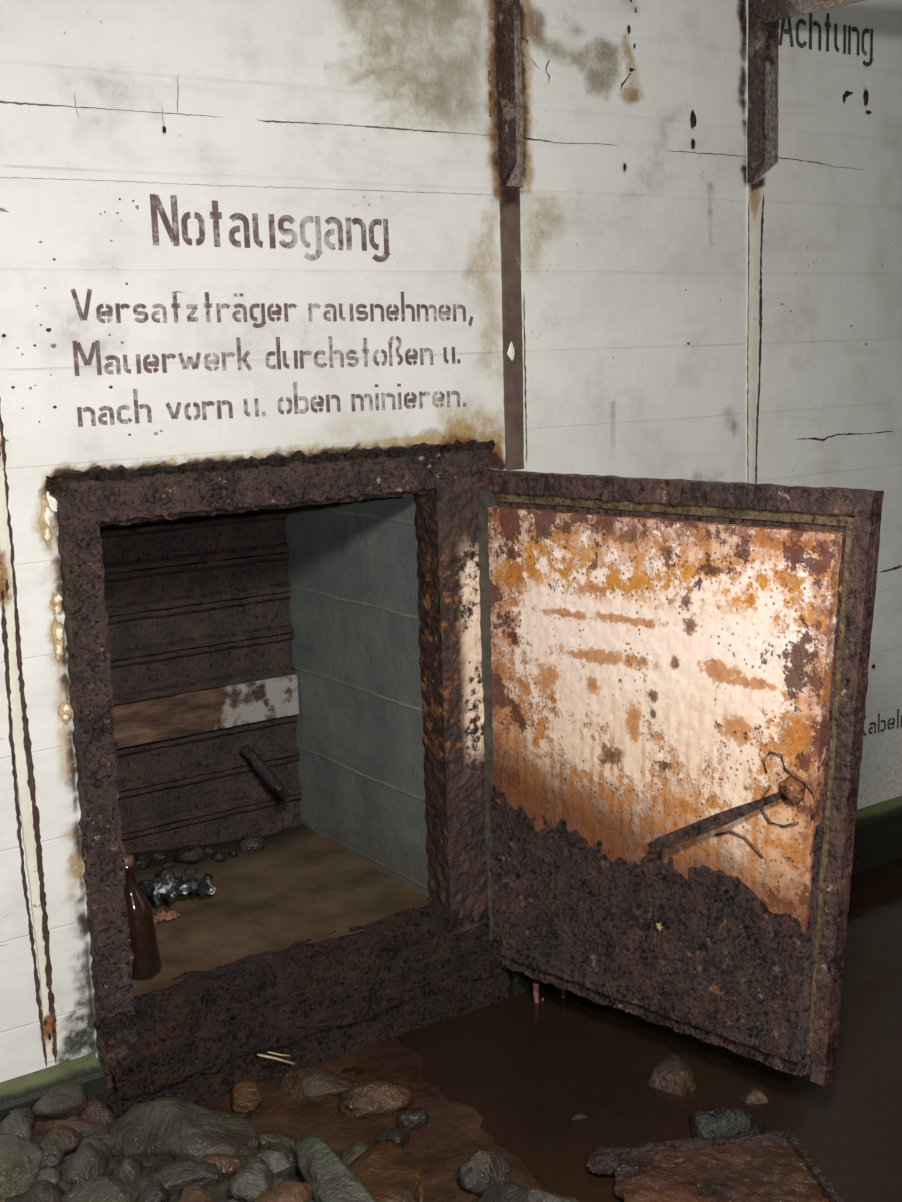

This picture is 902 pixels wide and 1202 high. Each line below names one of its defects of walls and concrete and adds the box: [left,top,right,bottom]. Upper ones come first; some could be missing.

corrosion [486,0,532,204]
corrosion [624,86,639,102]
corrosion [739,0,747,127]
corrosion [742,165,764,212]
corrosion [42,418,506,497]
corrosion [54,511,64,612]
corrosion [60,628,78,808]
corrosion [73,823,96,1046]
corrosion [490,784,822,1062]